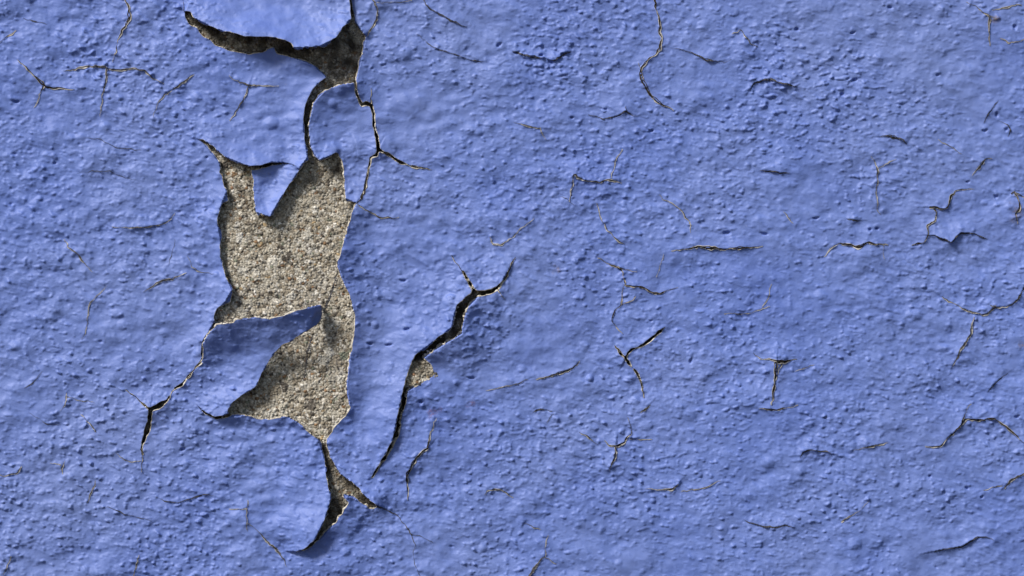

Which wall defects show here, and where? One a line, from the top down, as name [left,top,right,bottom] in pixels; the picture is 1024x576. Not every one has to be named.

crack [18,0,194,114]
crack [638,0,758,111]
crack [354,82,430,219]
crack [824,134,992,257]
crack [116,344,230,472]
peeling [184,0,383,553]
crack [371,218,534,576]
crack [561,149,762,472]
crack [754,354,812,411]
crack [925,373,1024,448]
crack [942,288,1024,365]